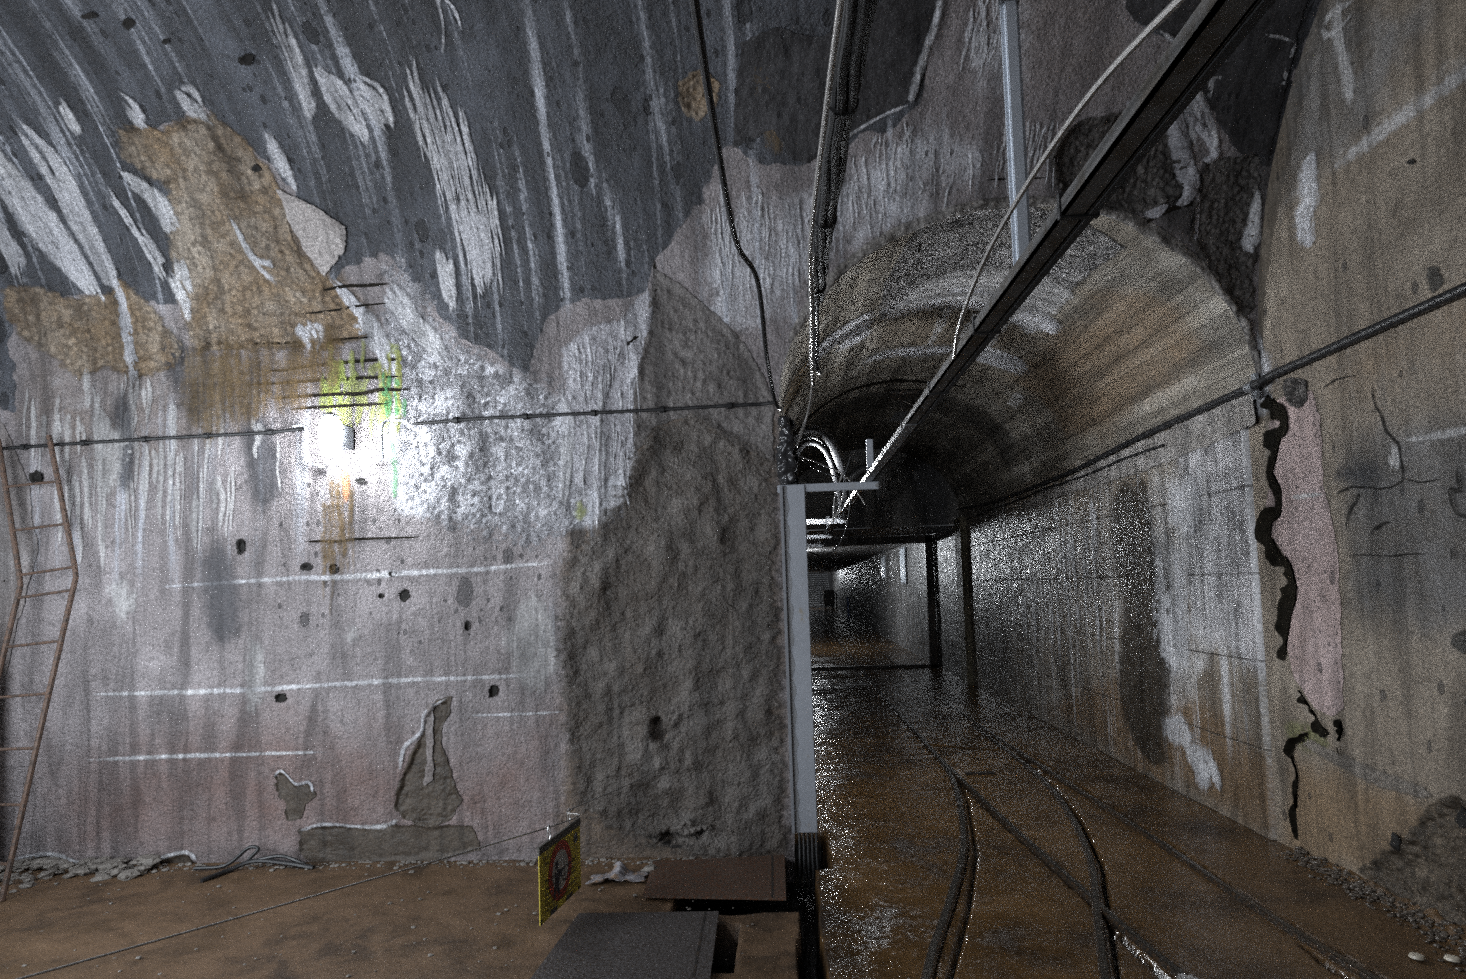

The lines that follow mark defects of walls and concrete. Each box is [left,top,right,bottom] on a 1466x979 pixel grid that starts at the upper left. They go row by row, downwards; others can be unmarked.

spalling [121,17,136,31]
spalling [238,53,253,66]
spalling [4,113,367,380]
crack [1323,375,1466,560]
crack [1254,394,1343,840]
flaking render [274,696,480,862]
spalling [1357,795,1466,926]